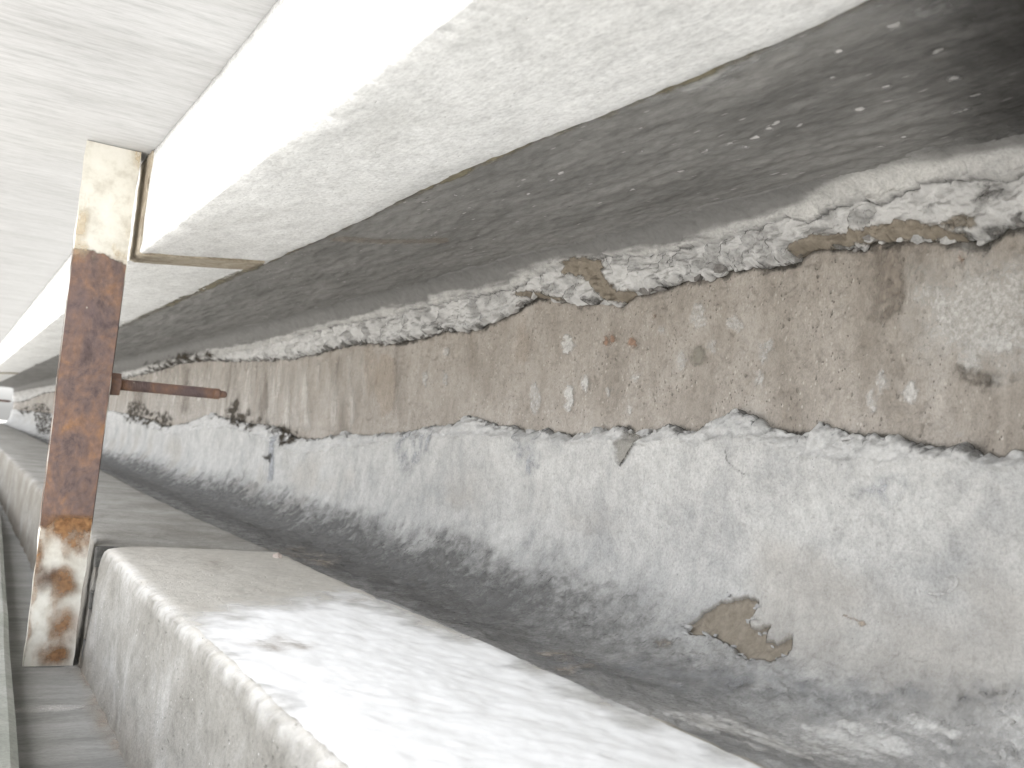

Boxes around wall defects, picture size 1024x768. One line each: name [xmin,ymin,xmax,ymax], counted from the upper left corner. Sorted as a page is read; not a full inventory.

spalling [108,212,1024,458]
water stain [11,392,54,445]
spalling [13,392,55,415]
rust [39,248,126,552]
water stain [108,352,319,480]
rust [32,543,75,602]
rust [39,610,72,664]